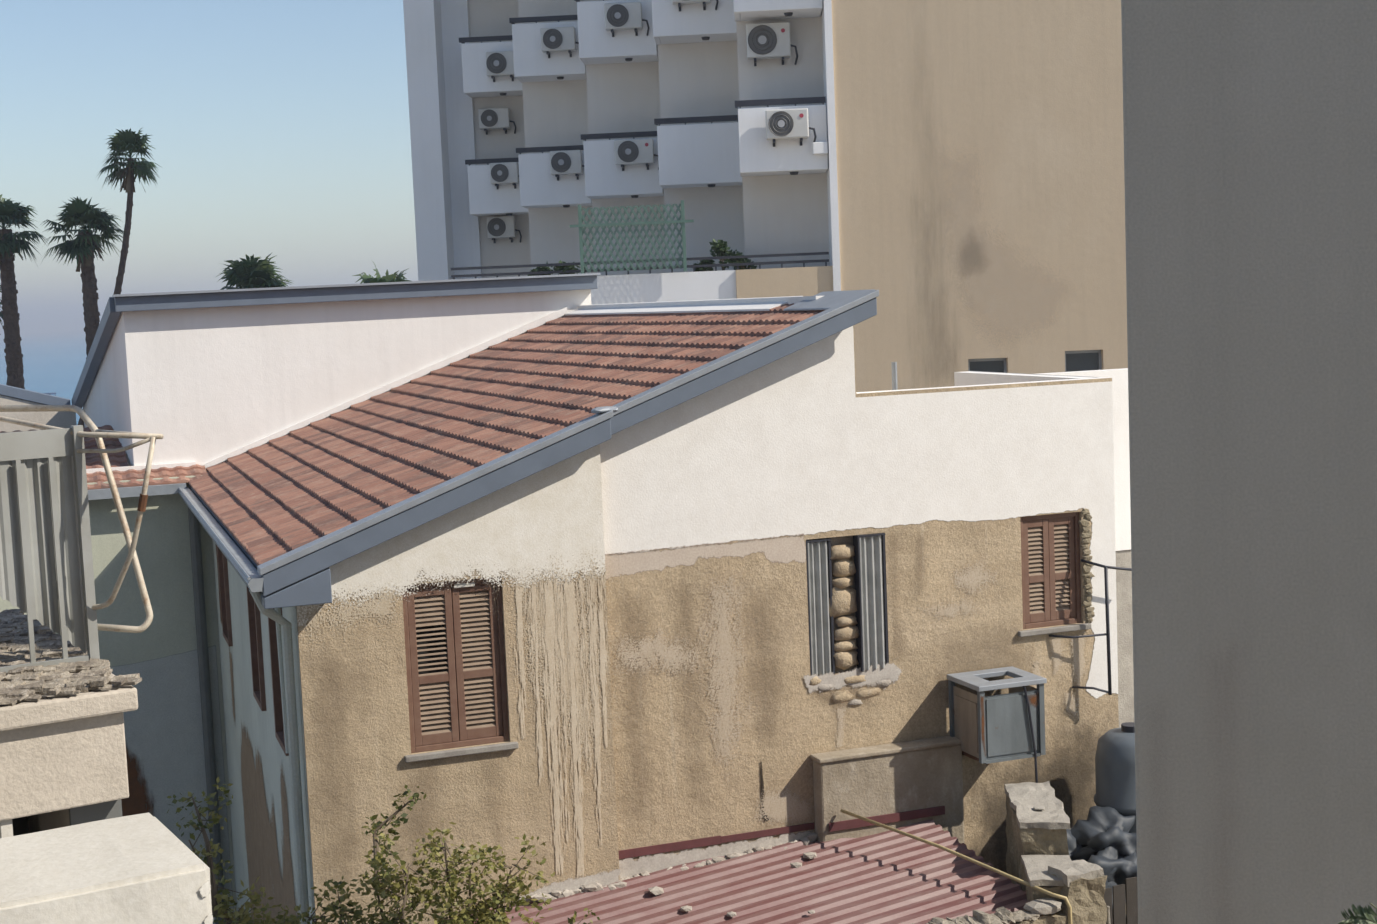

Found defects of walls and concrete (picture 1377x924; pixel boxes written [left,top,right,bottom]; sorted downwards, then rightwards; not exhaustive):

peeling [228,647,299,924]
water stain [486,545,757,879]
spalling [804,543,902,706]